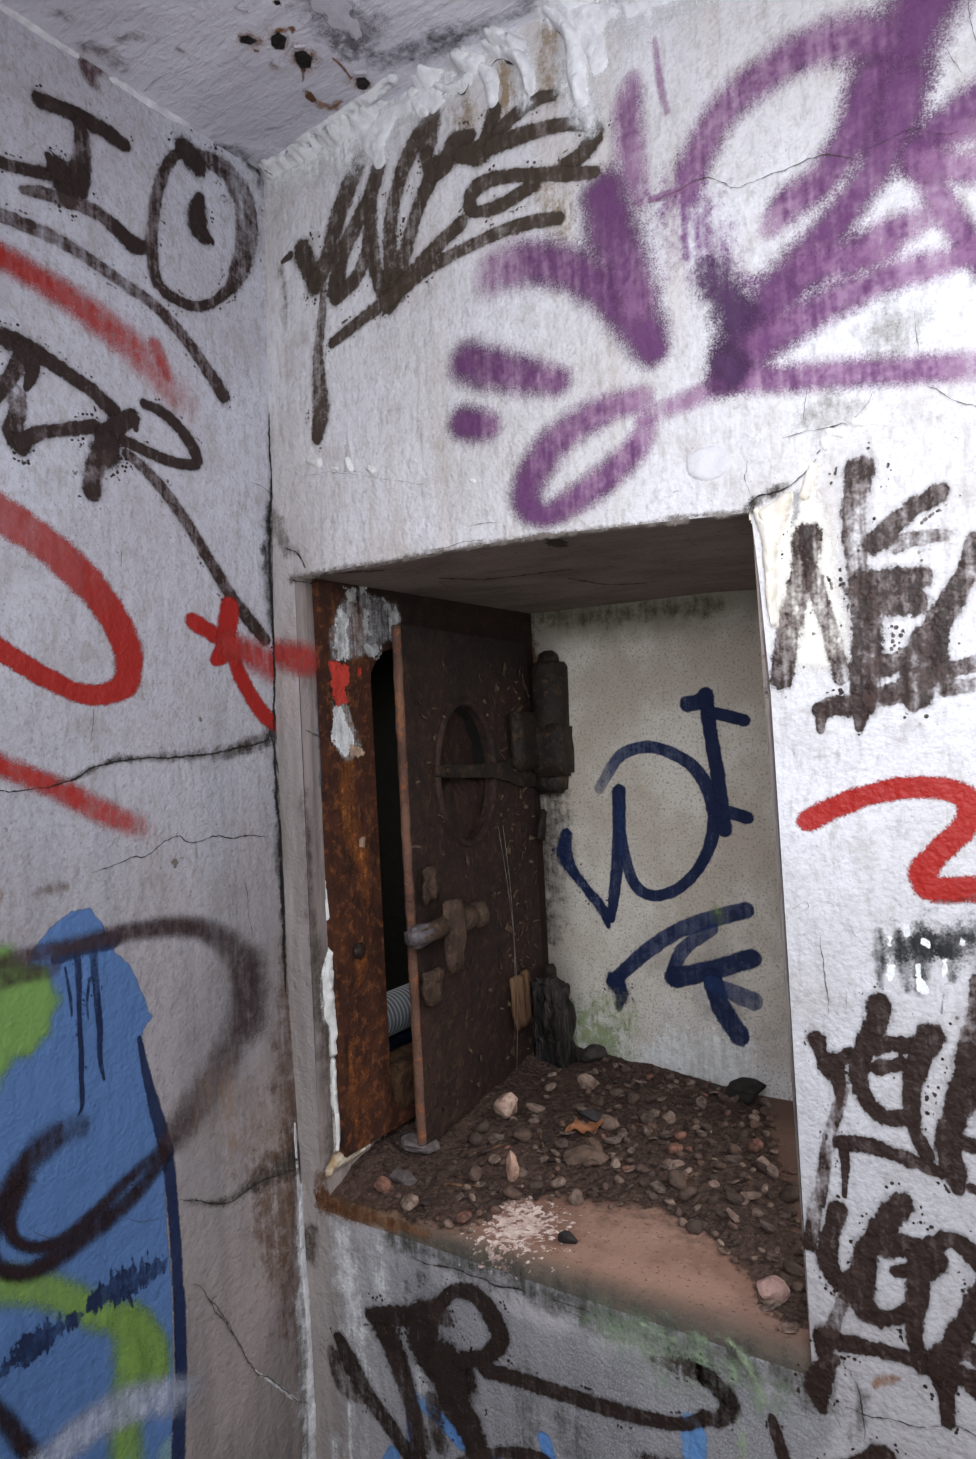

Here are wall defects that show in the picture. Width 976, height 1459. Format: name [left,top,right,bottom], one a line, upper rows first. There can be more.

peeling [271,510,753,662]
crack [0,414,286,991]
peeling [331,704,365,758]
leakage [252,982,811,1459]
crack [194,1284,311,1405]